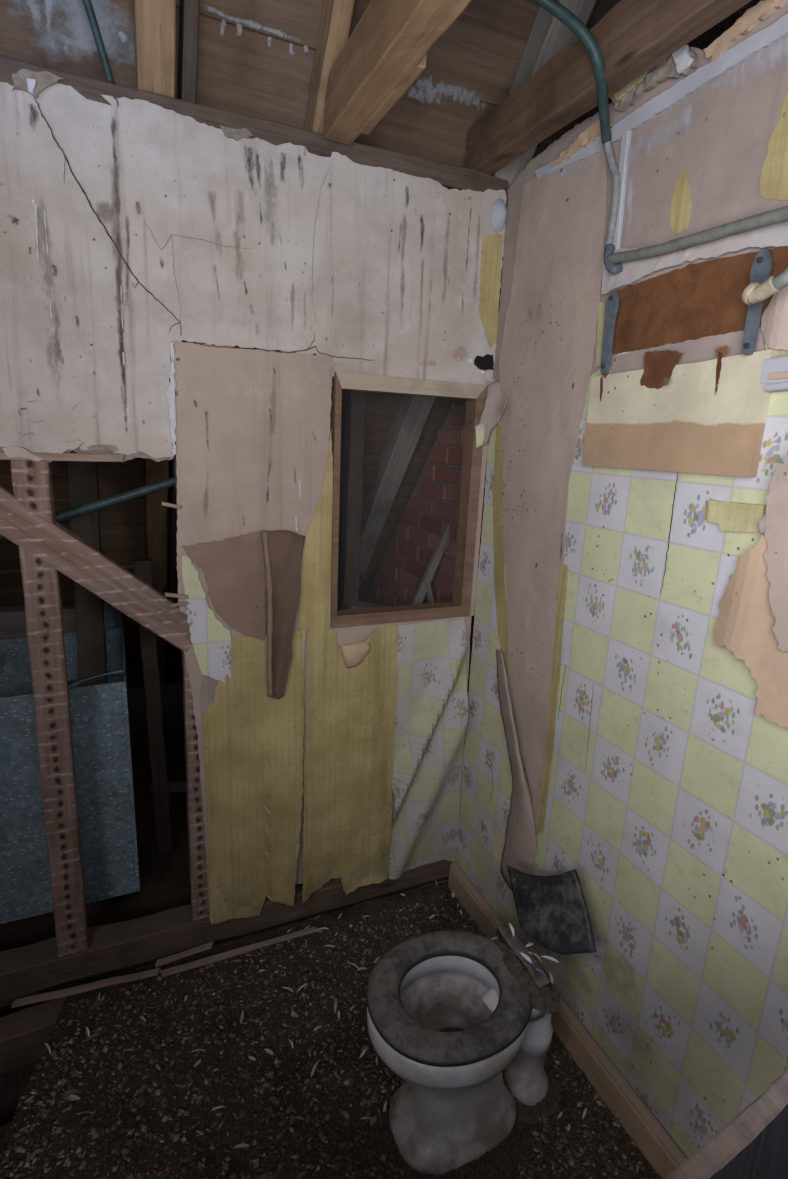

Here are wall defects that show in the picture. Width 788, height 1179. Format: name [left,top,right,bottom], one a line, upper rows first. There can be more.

leakage [28,0,126,53]
efflorescence [208,7,307,53]
spalling [550,0,787,168]
leakage [111,120,129,430]
crack [34,97,375,361]
peeling [640,350,683,389]